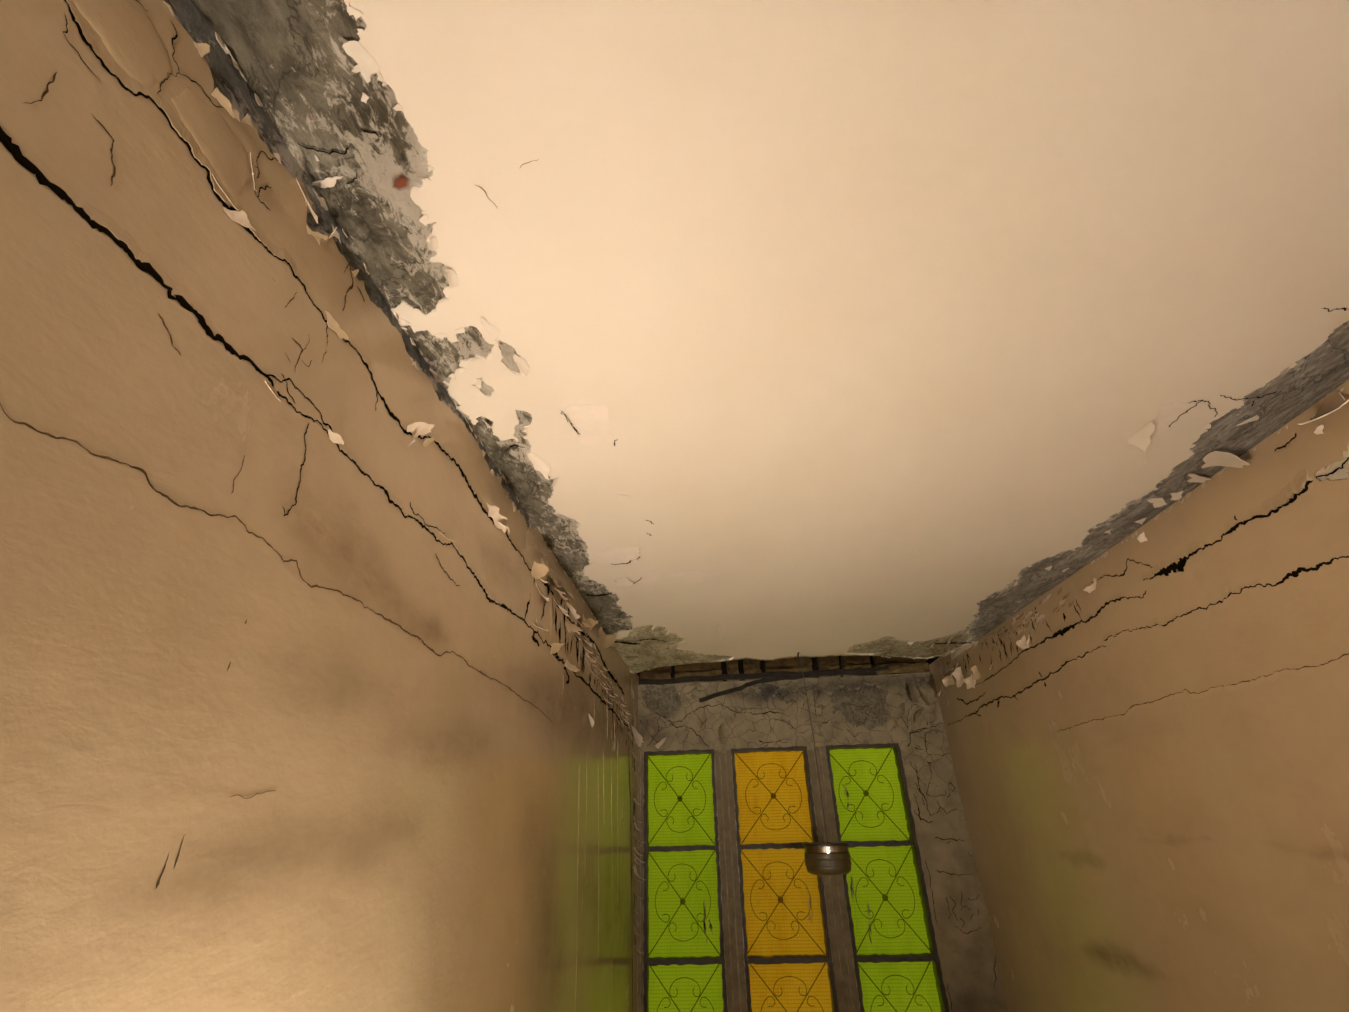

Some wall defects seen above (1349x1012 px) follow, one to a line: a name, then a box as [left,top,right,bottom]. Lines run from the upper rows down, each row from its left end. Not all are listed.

crack [0,0,855,912]
flaking render [163,0,1349,787]
crack [848,468,1349,934]